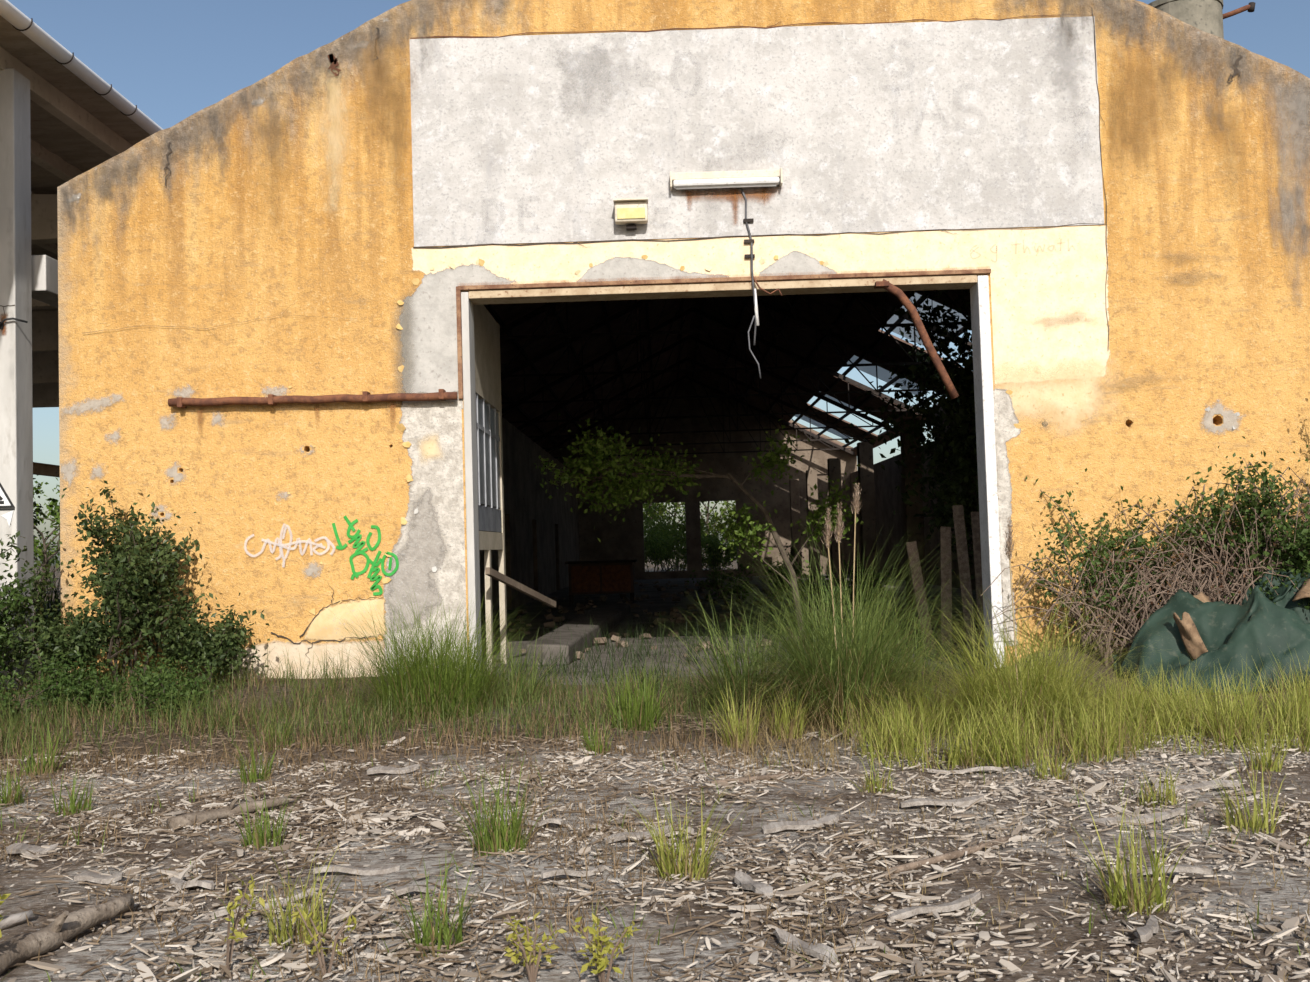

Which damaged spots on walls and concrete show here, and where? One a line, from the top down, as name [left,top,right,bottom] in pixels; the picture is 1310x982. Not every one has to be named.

rust [686,189,774,221]
spalling [174,385,198,398]
spalling [63,394,122,415]
hole [1202,400,1242,434]
peeling [230,225,1110,680]
spalling [60,460,109,484]
spalling [167,462,189,483]